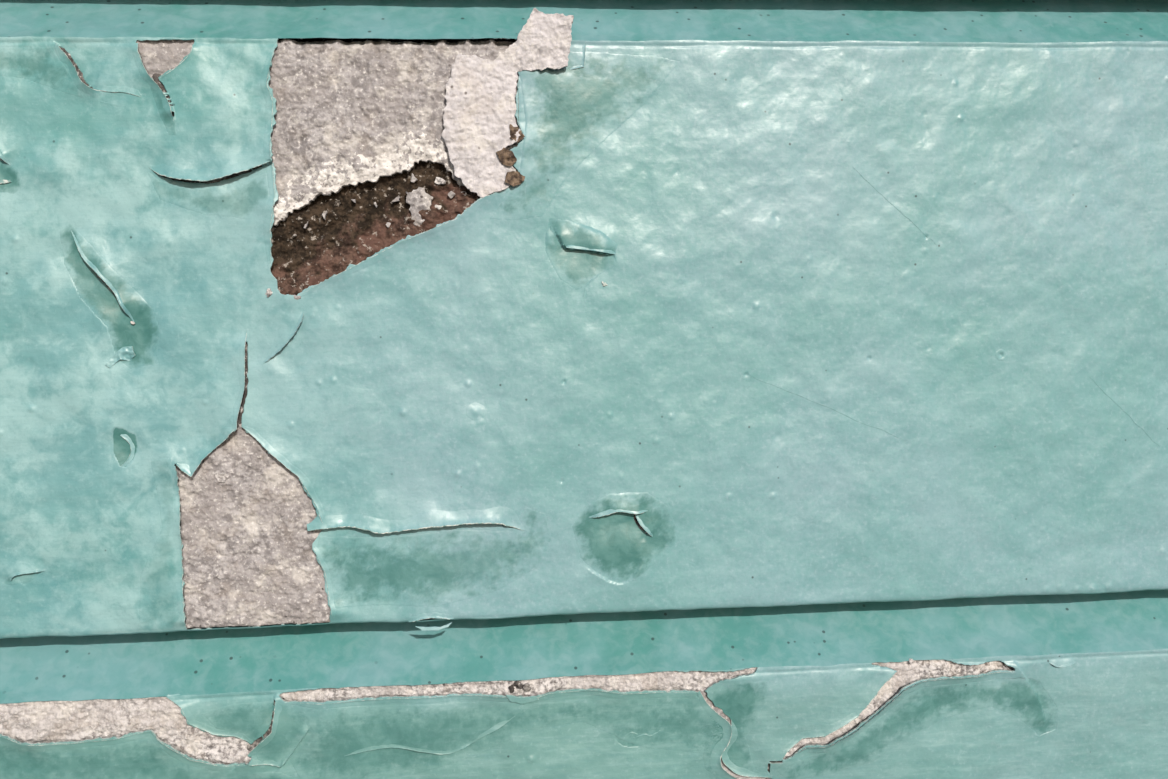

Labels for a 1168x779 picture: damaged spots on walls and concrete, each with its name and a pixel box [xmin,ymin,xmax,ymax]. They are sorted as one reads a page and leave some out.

peeling [0,40,200,135]
spalling [147,8,680,300]
crack [232,331,248,429]
peeling [138,424,552,631]
peeling [0,667,757,779]
peeling [776,658,1058,779]